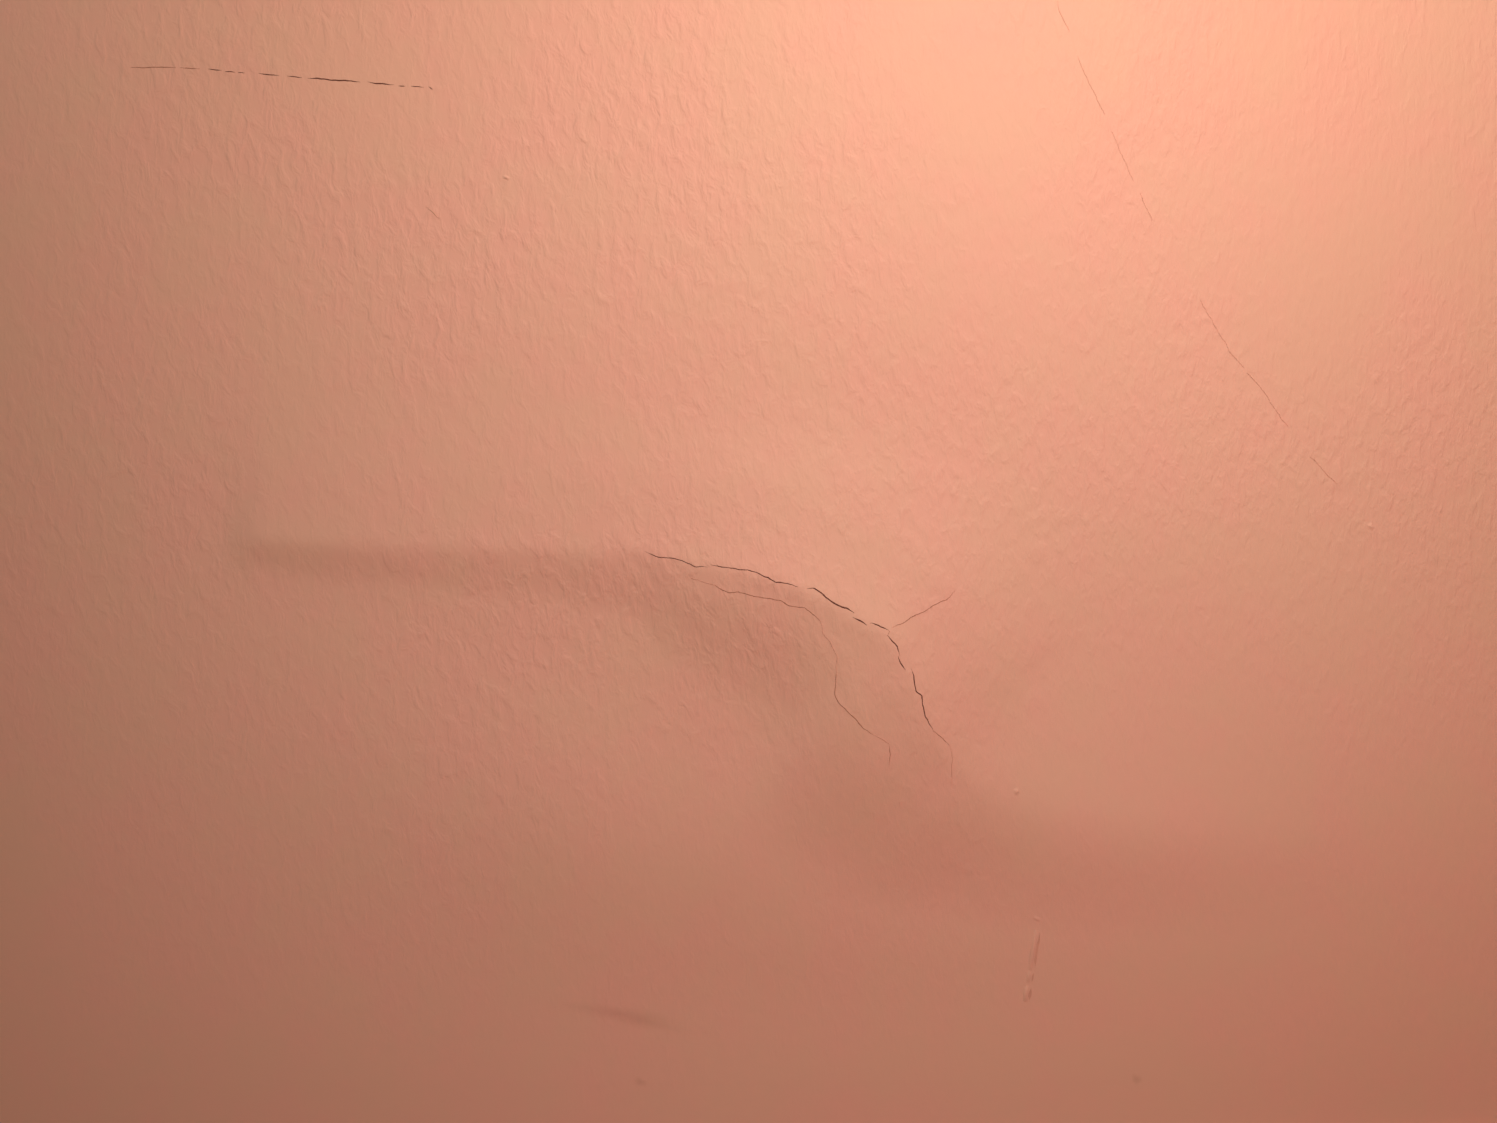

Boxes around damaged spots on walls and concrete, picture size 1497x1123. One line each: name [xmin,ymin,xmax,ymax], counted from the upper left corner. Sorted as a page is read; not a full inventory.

crack [134,67,433,90]
crack [649,553,953,775]